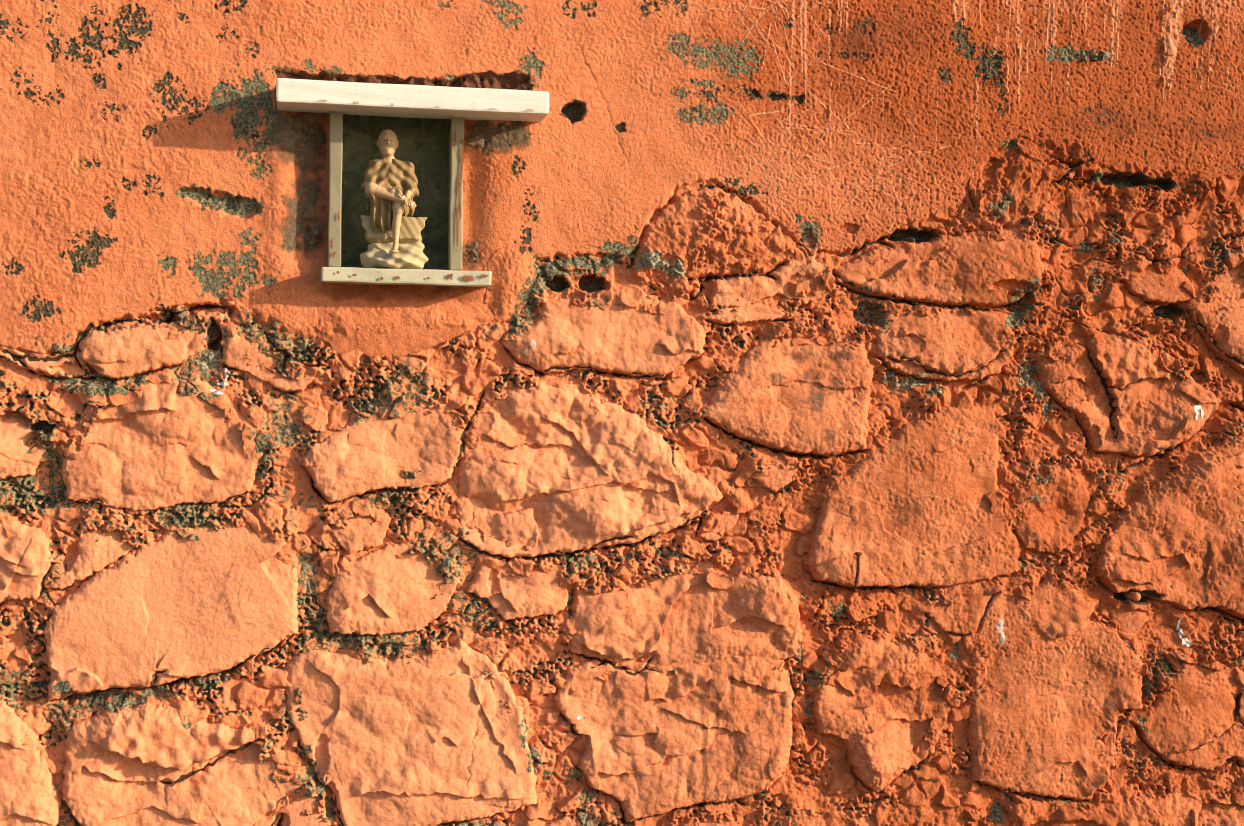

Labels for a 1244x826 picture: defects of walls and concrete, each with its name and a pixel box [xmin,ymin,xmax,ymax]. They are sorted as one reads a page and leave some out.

peeling [59,227,117,277]
peeling [122,174,277,301]
damp [269,111,327,251]
peeling [142,0,548,180]
damp [462,242,479,269]
damp [466,109,532,154]
peeling [482,120,688,336]
peeling [665,30,794,126]
damp [953,0,982,27]
damp [993,0,1121,107]
damp [1158,0,1238,111]
peeling [52,675,231,713]